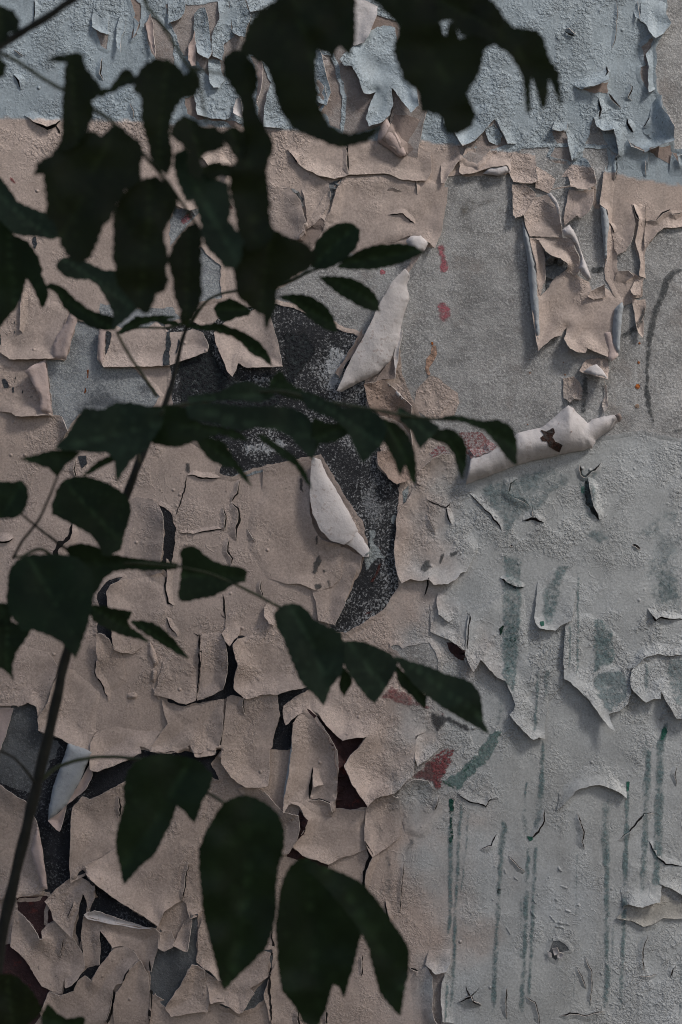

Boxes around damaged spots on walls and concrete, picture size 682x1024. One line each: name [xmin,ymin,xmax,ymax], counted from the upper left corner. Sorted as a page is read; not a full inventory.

peeling [0,0,682,740]
crack [176,463,256,565]
peeling [0,497,469,1024]
water stain [445,799,468,1021]
water stain [491,822,507,1007]
water stain [519,743,545,1006]
water stain [601,808,627,1001]
water stain [622,724,668,885]